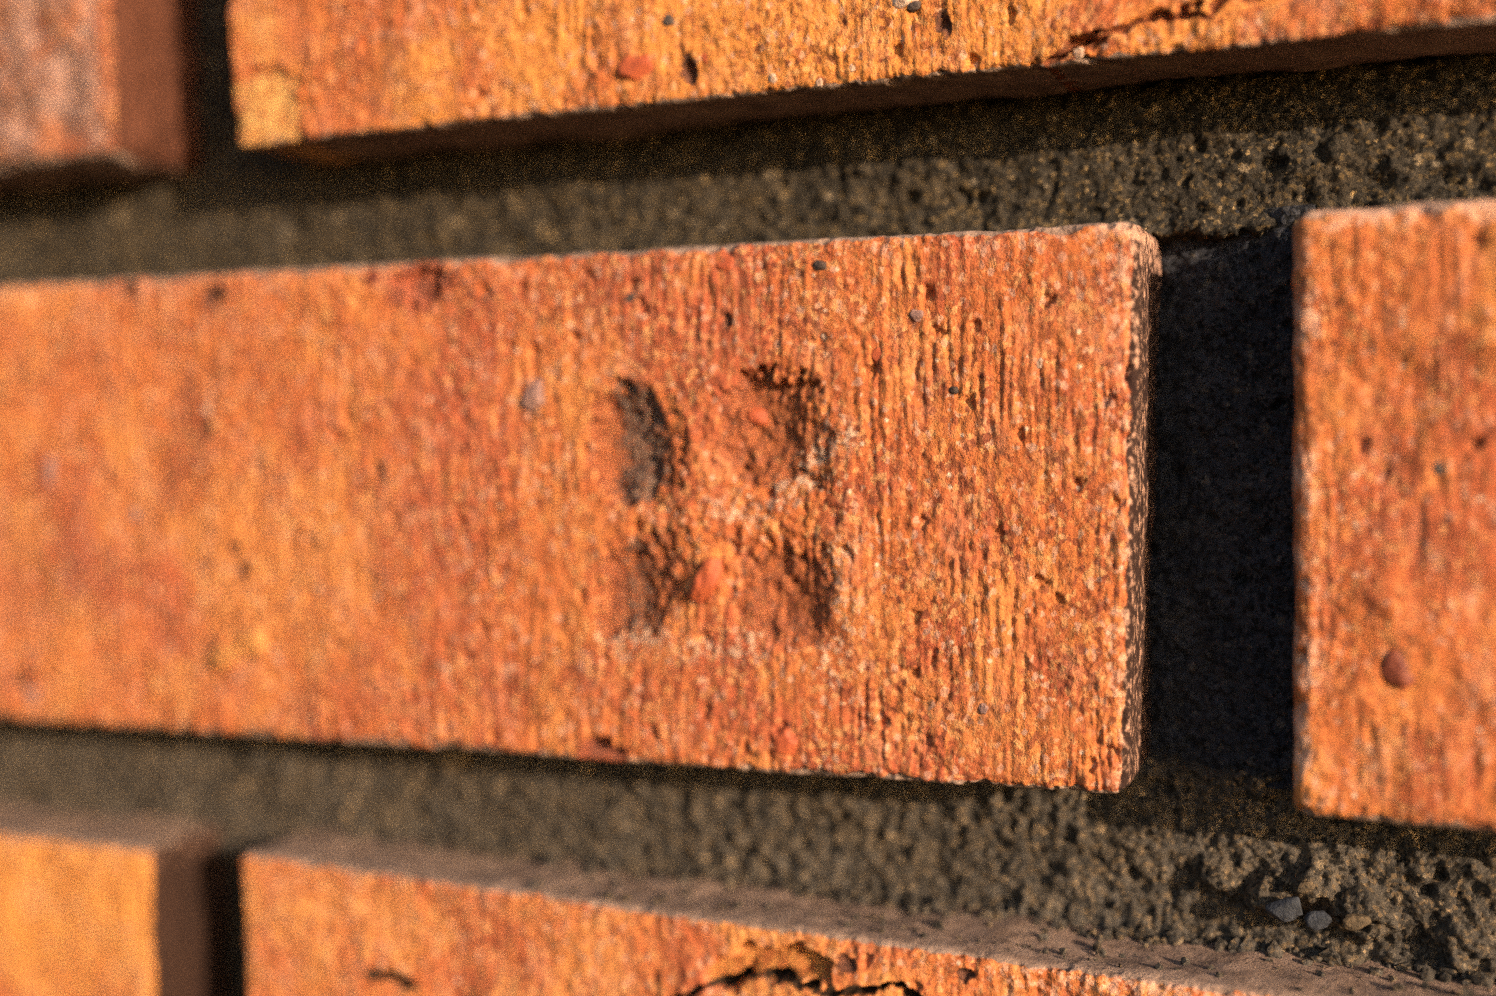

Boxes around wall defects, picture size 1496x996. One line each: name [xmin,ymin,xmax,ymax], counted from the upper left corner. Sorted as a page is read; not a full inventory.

crack [1044,0,1262,92]
spalling [584,377,683,507]
spalling [718,365,833,488]
spalling [595,531,685,645]
spalling [739,545,835,650]
crack [659,940,921,996]